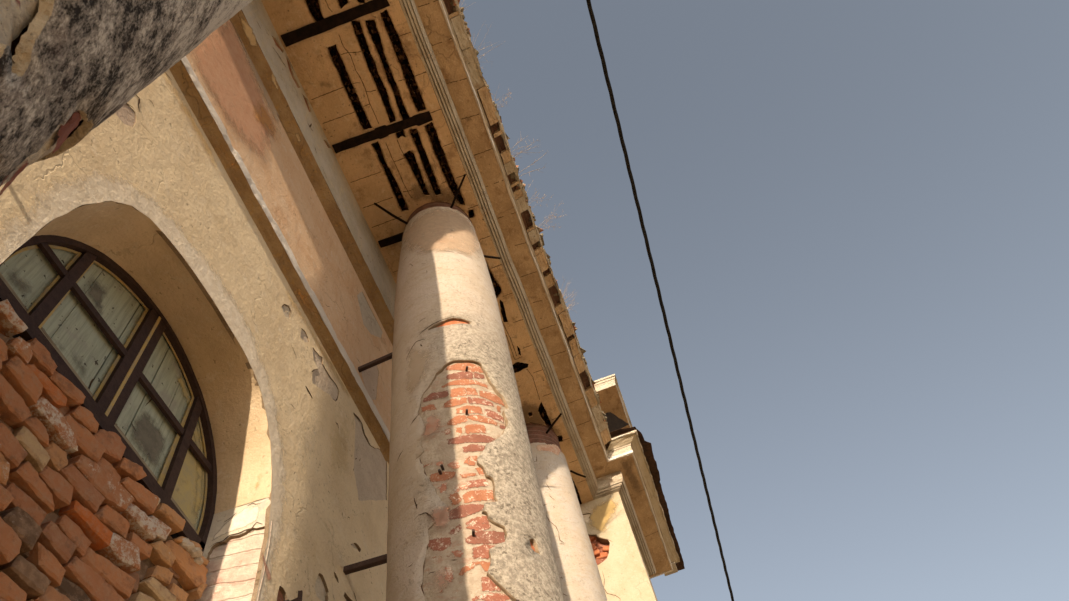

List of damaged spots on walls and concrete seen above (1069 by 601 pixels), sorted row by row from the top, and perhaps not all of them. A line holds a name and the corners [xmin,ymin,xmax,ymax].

flaking render [0,0,39,50]
leakage [193,21,276,154]
flaking render [0,111,82,195]
peeling [404,209,477,253]
peeling [301,329,338,401]
flaking render [417,363,519,601]
flaking render [196,521,272,601]
spalling [589,536,610,565]